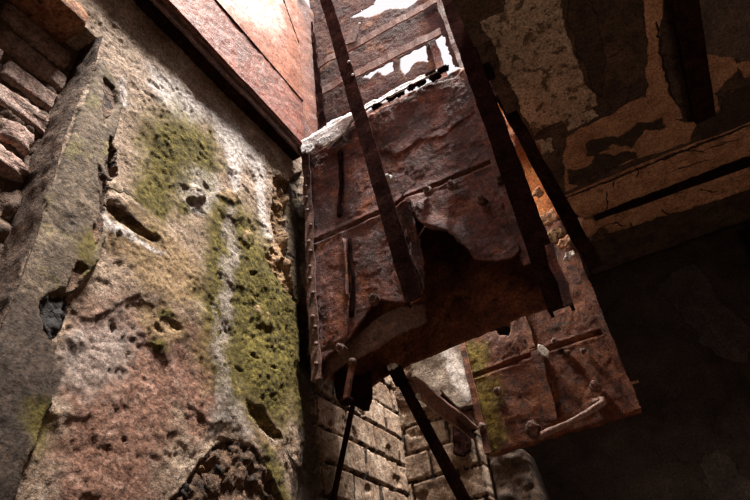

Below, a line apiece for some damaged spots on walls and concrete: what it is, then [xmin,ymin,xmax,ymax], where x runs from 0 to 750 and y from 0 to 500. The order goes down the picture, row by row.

flaking render [17,58,123,345]
water stain [119,81,127,105]
water stain [149,67,272,238]
peeling [480,0,696,192]
flaking render [707,54,750,112]
spalling [245,170,324,500]
spalling [170,426,278,500]